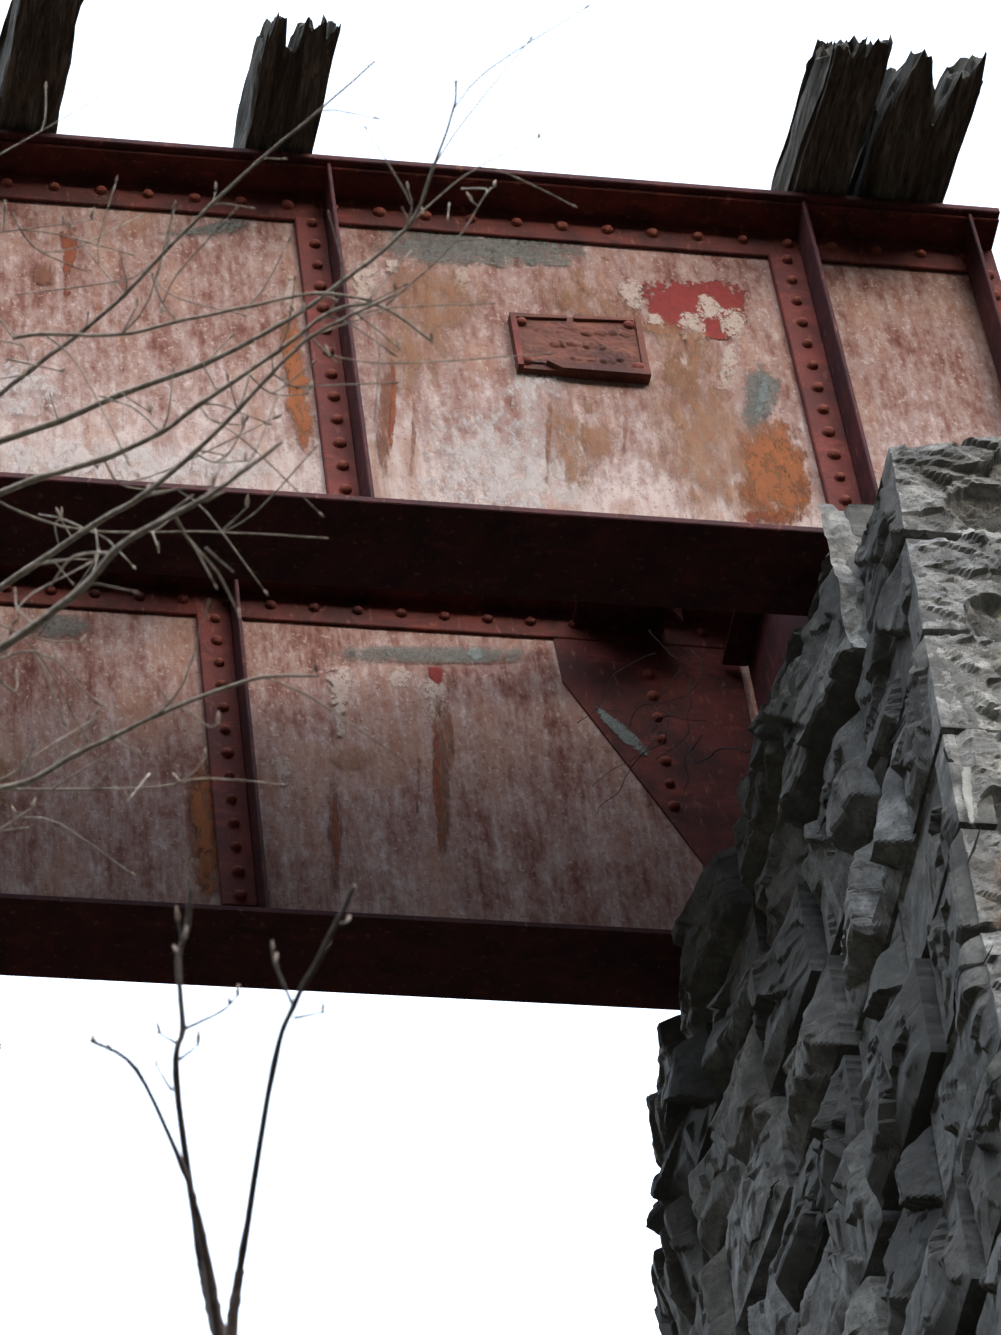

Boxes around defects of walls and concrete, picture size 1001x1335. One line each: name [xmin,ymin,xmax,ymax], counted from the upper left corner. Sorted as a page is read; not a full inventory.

rust [280,273,315,453]
rust [376,262,487,469]
rust [541,268,811,525]
peeling [617,279,749,393]
rust [418,699,454,853]